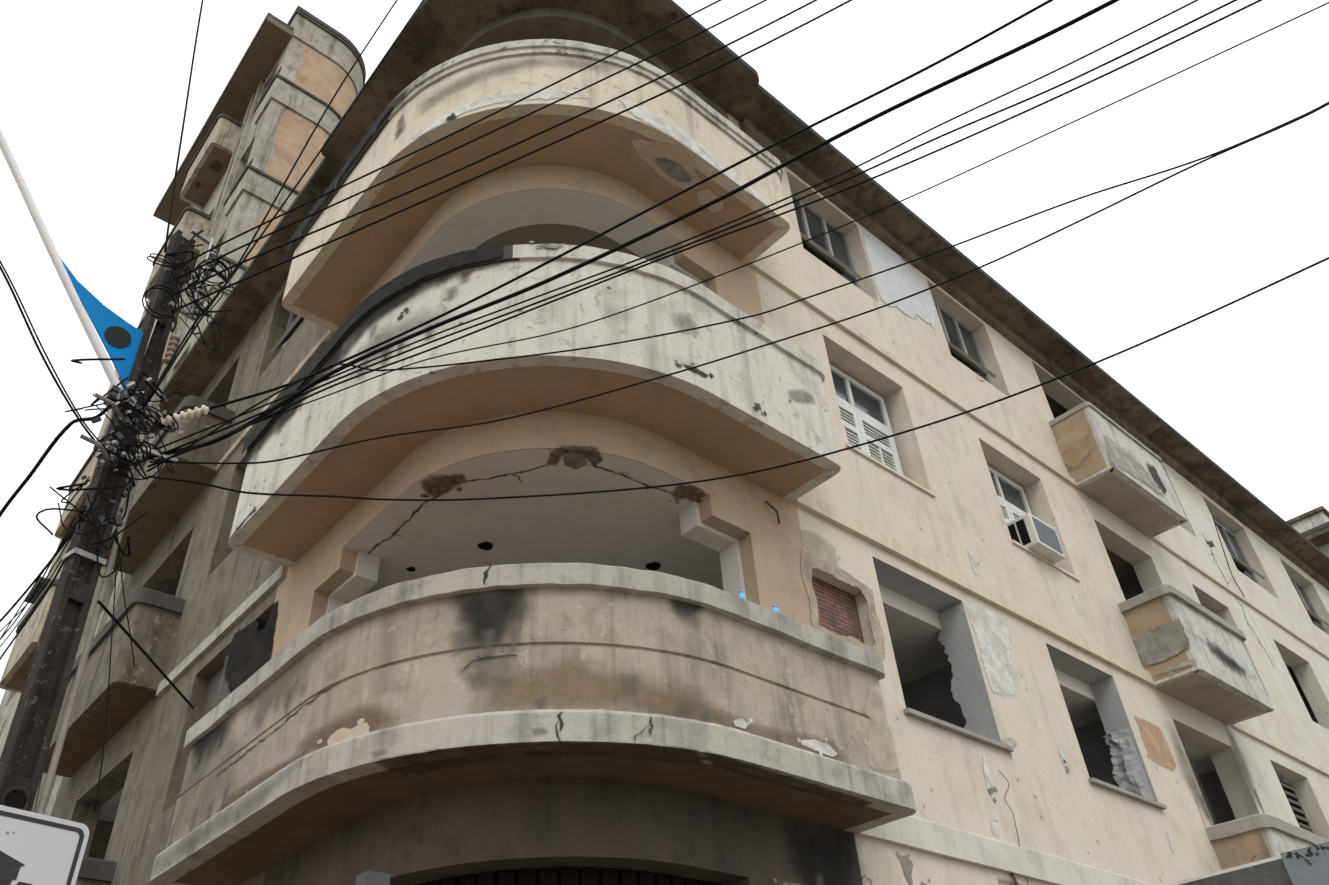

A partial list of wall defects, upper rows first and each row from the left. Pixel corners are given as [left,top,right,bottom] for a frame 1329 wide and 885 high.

spalling [547,446,602,470]
spalling [421,475,467,498]
crack [592,465,672,493]
spalling [669,485,705,504]
crack [368,465,548,555]
water stain [455,588,525,648]
water stain [673,600,703,626]
spalling [938,600,1018,756]
spalling [317,718,370,745]
peeling [797,737,837,757]
peeling [983,755,999,836]